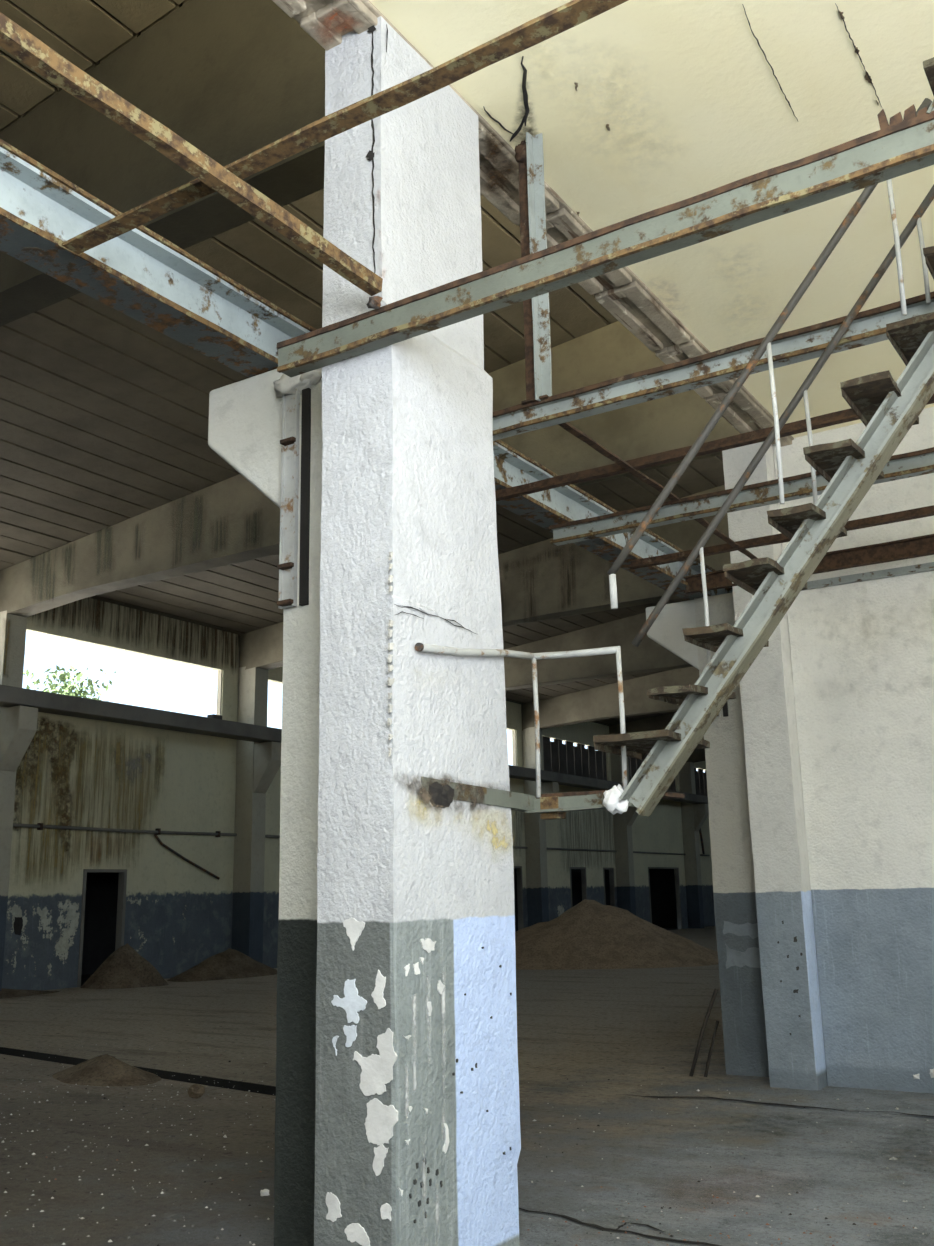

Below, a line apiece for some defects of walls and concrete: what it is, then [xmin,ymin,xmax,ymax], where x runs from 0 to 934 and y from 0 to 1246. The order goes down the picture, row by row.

crack [483,56,530,142]
crack [742,4,798,121]
crack [835,3,882,107]
rust [0,0,934,373]
crack [395,604,476,634]
water stain [19,731,159,877]
rust [407,776,492,810]
peeling [6,899,80,978]
peeling [403,938,436,976]
peeling [331,970,428,1176]
peeling [326,1192,370,1246]
crack [519,1208,722,1246]